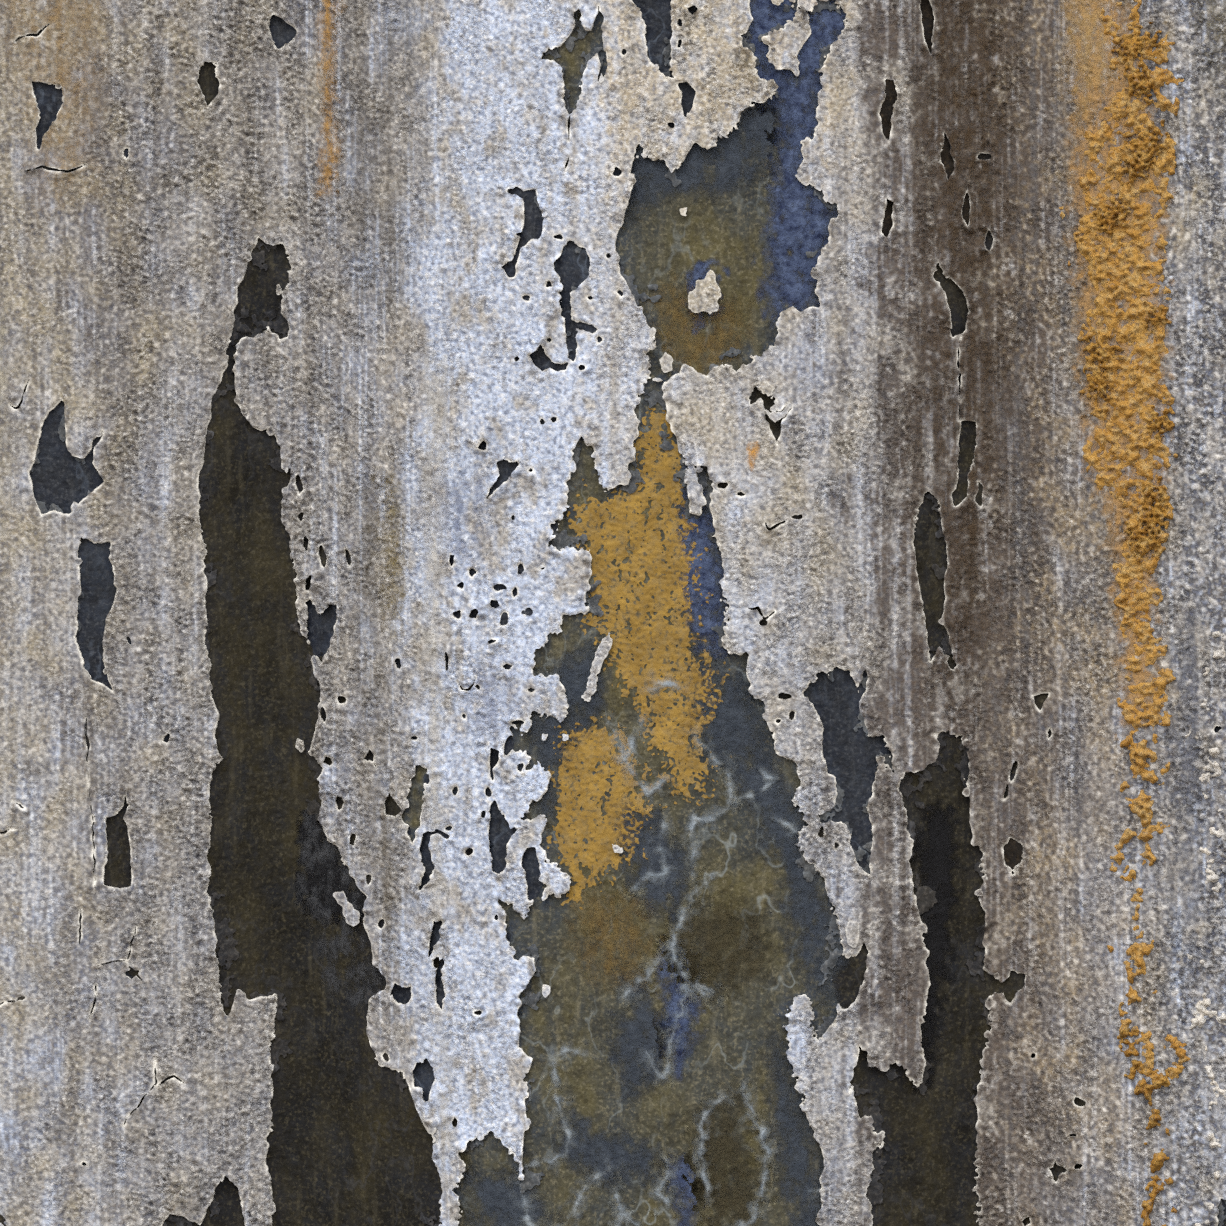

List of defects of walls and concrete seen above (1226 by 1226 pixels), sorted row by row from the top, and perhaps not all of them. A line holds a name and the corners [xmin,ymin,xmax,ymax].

peeling [30,401,104,514]
peeling [74,538,117,690]
peeling [197,0,1026,1226]
rust [1059,0,1191,1226]
peeling [102,797,132,893]
peeling [163,1176,245,1226]
peeling [1217,1198,1226,1226]